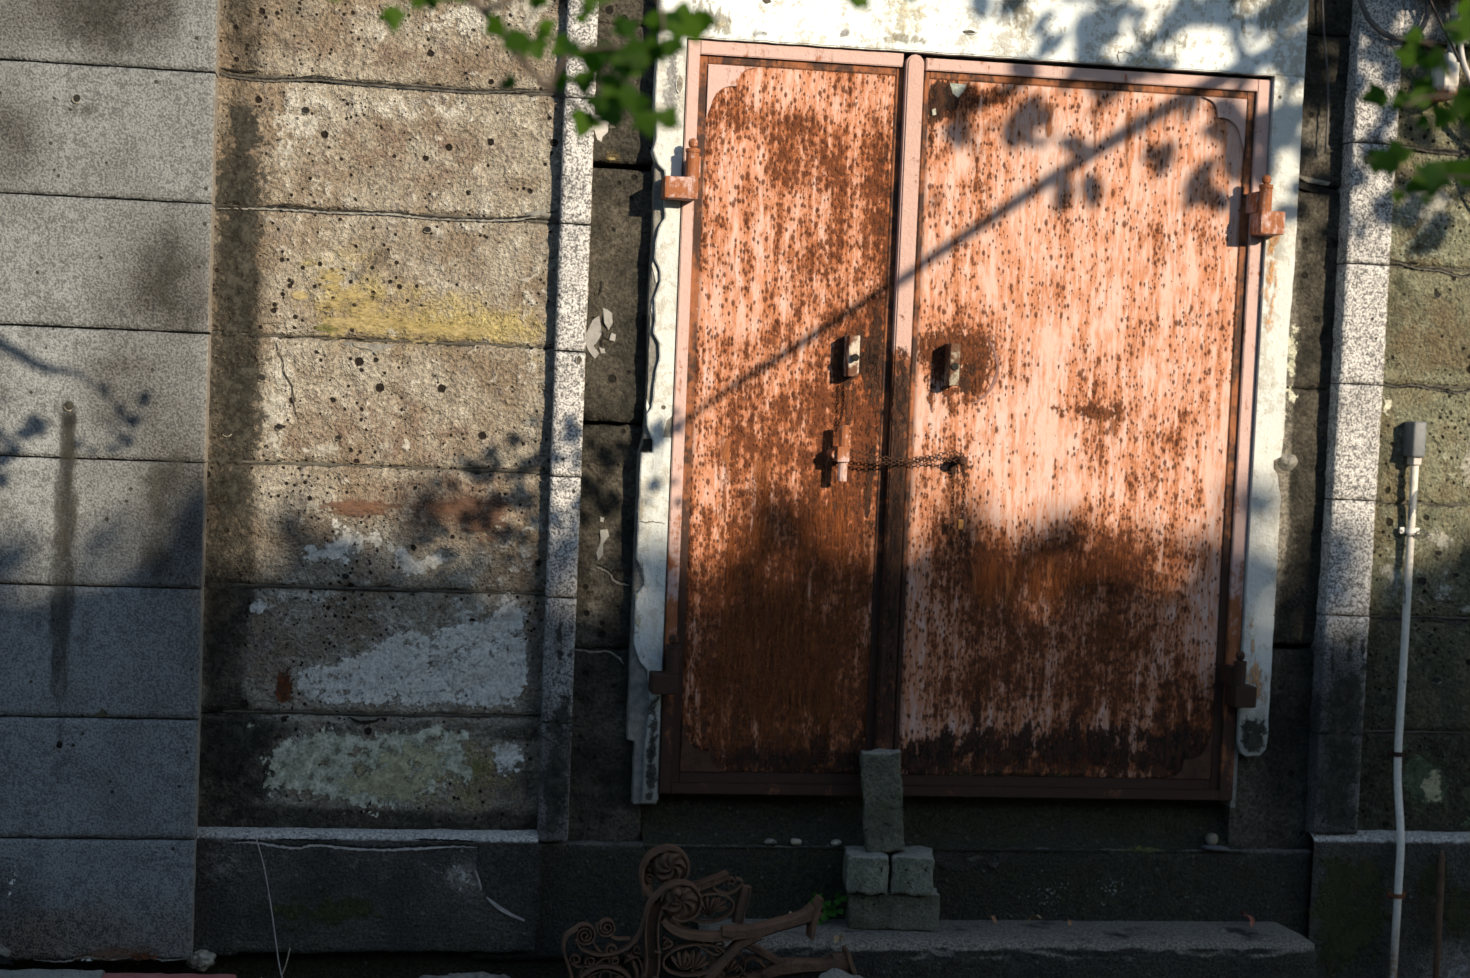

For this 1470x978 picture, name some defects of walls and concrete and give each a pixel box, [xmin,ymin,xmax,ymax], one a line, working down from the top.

corrosion [929,82,969,165]
corrosion [1046,103,1056,137]
corrosion [1126,112,1134,171]
spalling [640,427,668,453]
damp [51,401,77,671]
corrosion [833,297,1212,780]
damp [297,592,529,709]